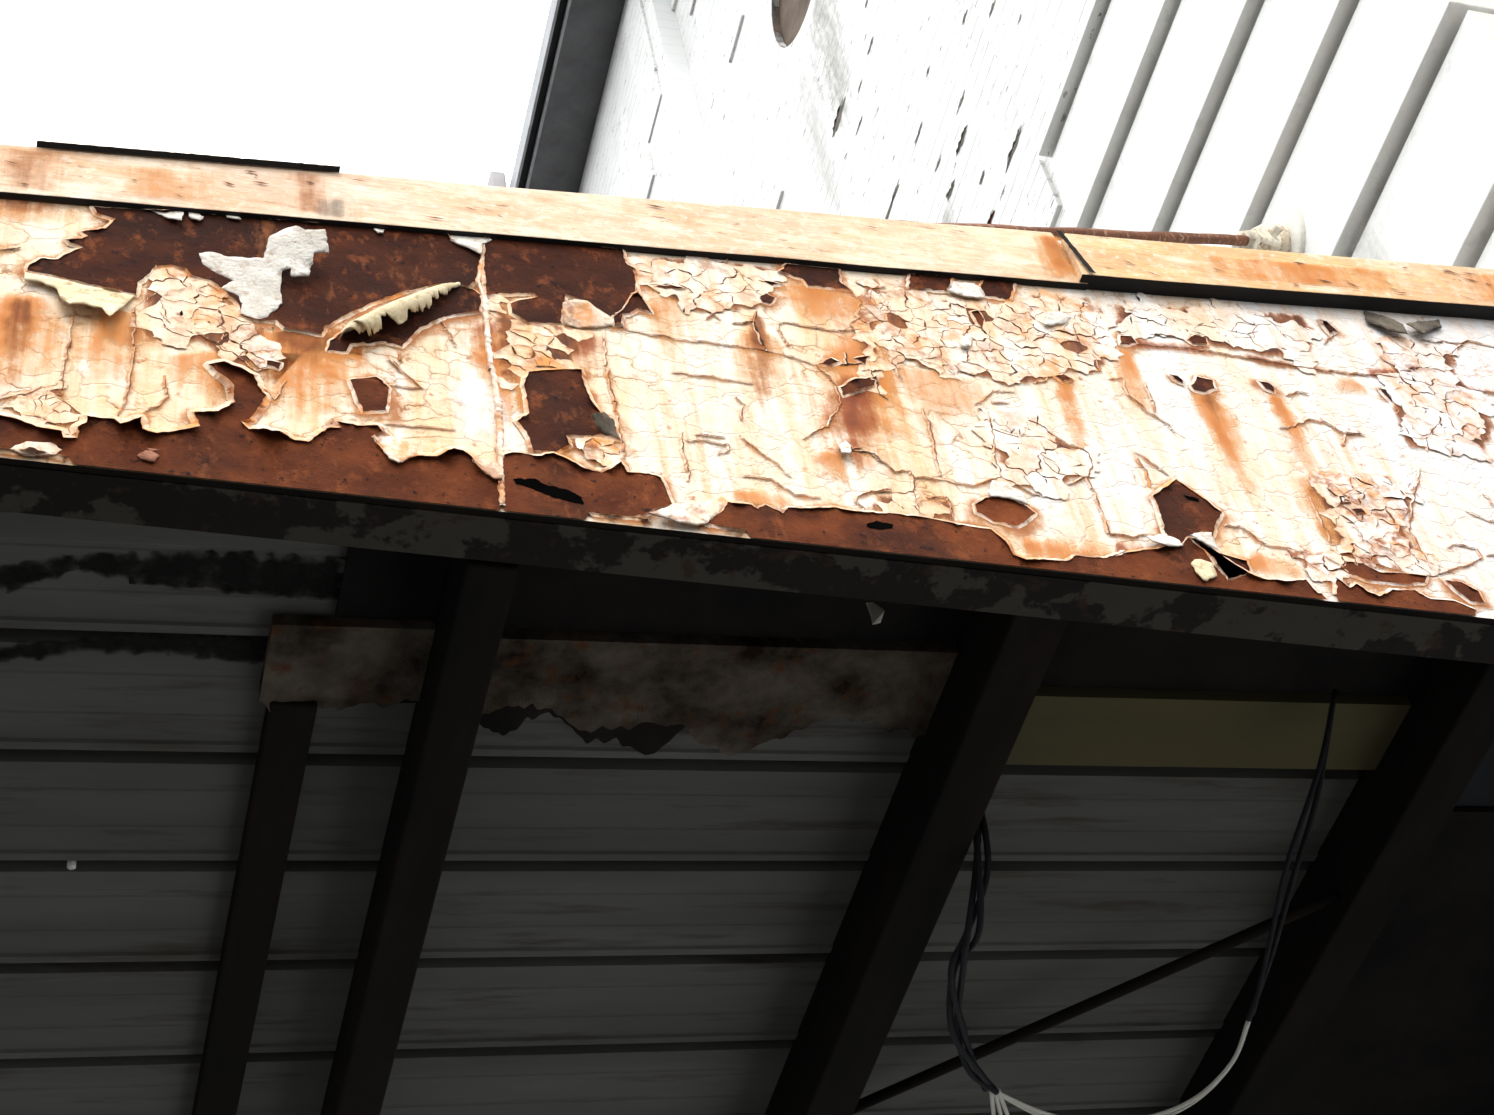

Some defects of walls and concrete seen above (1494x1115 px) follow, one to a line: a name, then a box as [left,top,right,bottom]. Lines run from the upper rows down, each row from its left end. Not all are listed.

corrosion [0,294,58,370]
corrosion [177,329,363,408]
peeling [16,205,689,358]
crack [440,321,457,346]
corrosion [474,322,526,410]
peeling [758,263,854,308]
peeling [903,273,1020,347]
crack [488,254,1494,584]
corrosion [1194,394,1243,473]
peeling [0,355,1492,615]
water stain [0,550,346,599]
water stain [0,633,269,663]